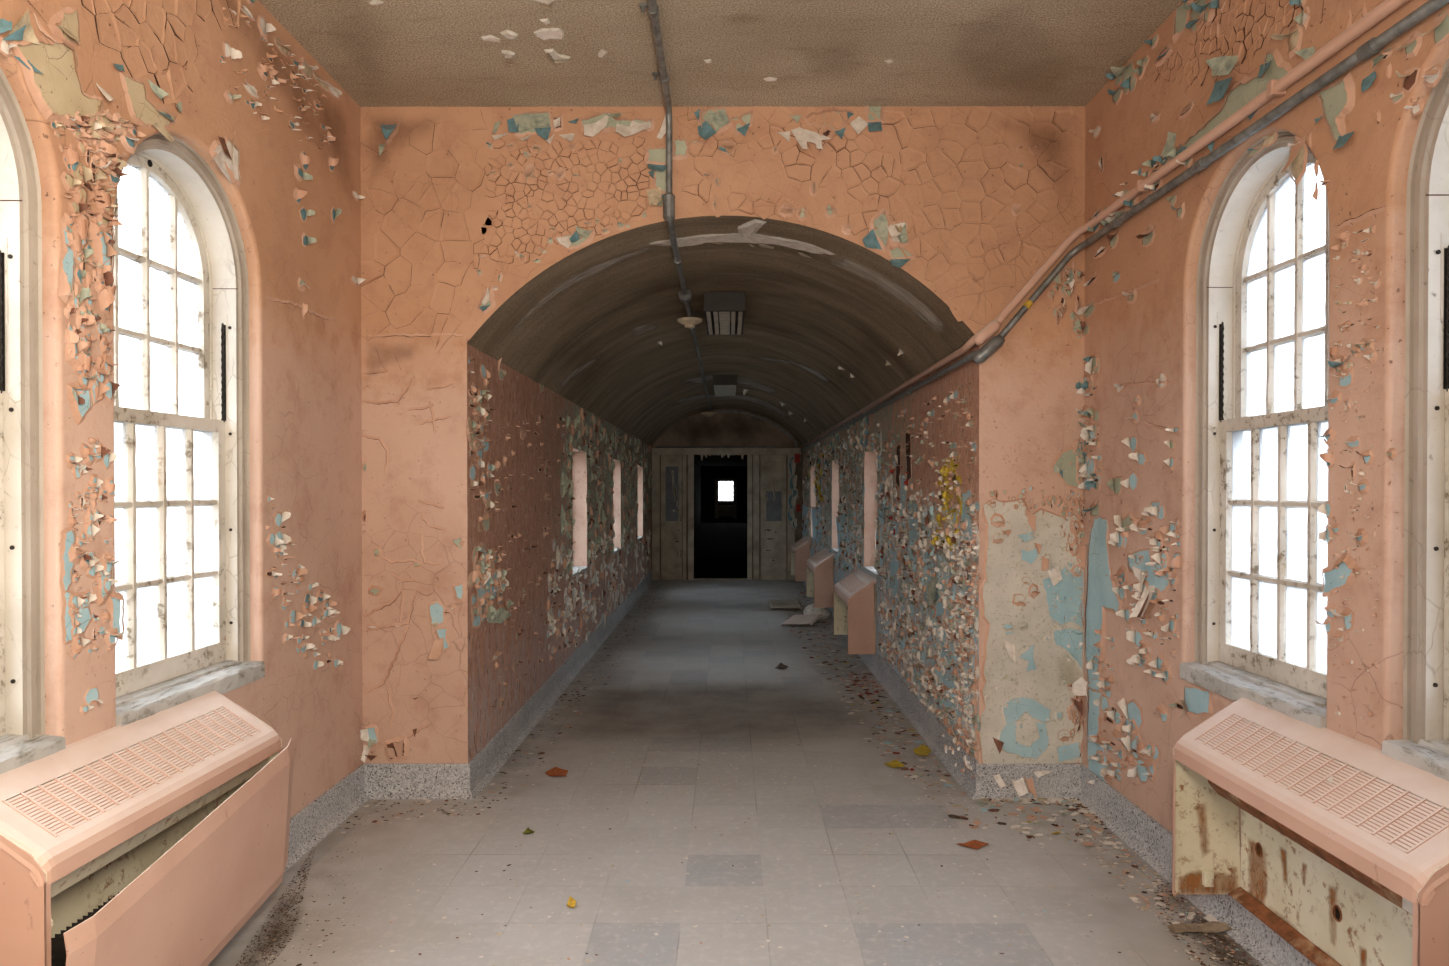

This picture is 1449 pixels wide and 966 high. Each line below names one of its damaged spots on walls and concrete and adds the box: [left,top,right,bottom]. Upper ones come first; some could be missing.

peeling [0,7,182,660]
peeling [476,254,503,314]
peeling [481,0,570,66]
peeling [427,357,678,709]
peeling [486,107,755,264]
crack [266,106,1085,555]
peeling [649,181,916,268]
peeling [772,105,884,154]
peeling [766,352,1213,824]
peeling [1032,0,1321,339]
peeling [1248,9,1449,200]
peeling [1314,224,1397,727]